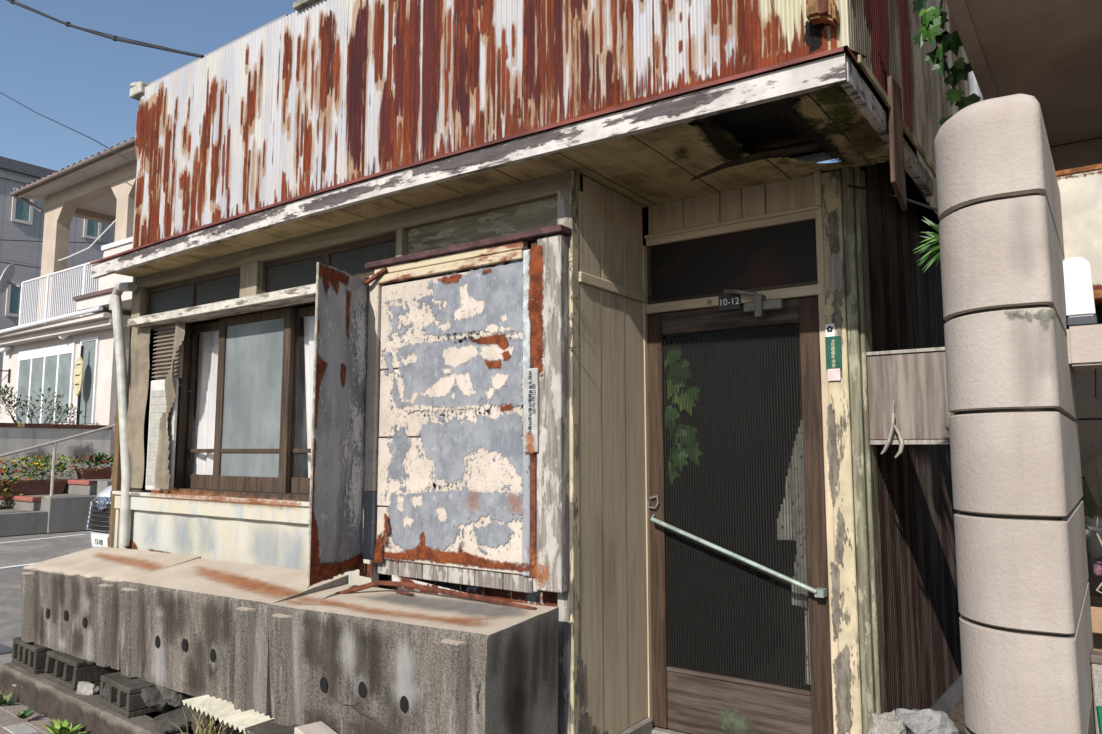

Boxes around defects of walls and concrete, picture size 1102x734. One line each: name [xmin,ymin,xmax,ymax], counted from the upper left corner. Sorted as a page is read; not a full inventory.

corrosion [133,0,837,248]
corrosion [851,0,911,147]
peeling [828,208,840,255]
peeling [340,298,368,540]
corrosion [200,350,548,625]
peeling [381,259,530,555]
corrosion [468,334,511,369]
peeling [826,403,852,734]
damp [306,715,336,731]
damp [305,616,381,709]
damp [354,650,415,734]
damp [505,628,548,734]